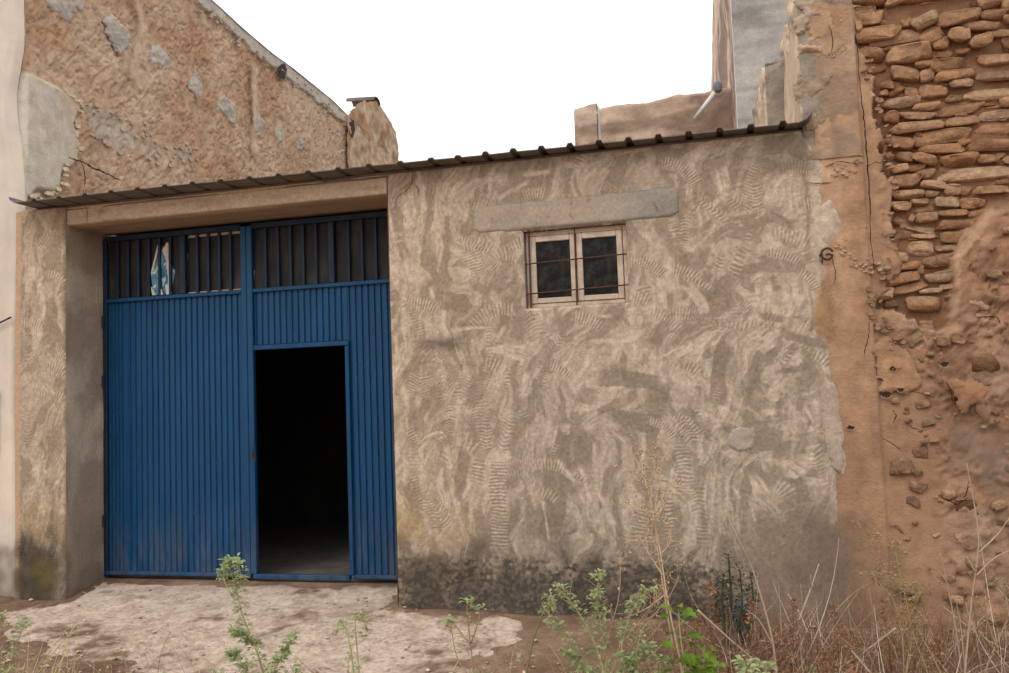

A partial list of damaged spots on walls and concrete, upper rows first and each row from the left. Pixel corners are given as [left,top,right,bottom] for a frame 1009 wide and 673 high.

flaking render [873,90,886,114]
crack [806,45,886,269]
flaking render [883,124,900,193]
spalling [834,239,922,399]
spalling [949,378,990,413]
water stain [2,541,55,601]
water stain [454,563,694,620]